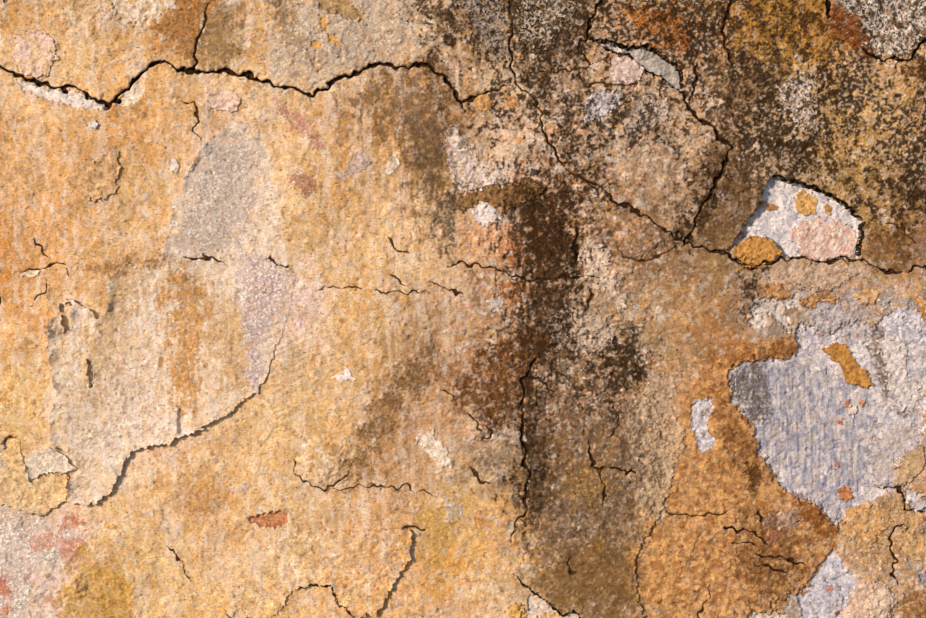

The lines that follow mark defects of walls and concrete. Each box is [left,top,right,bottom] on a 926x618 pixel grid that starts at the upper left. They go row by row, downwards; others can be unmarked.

crack [22,239,69,307]
peeling [0,90,293,516]
crack [319,227,600,310]
crack [0,0,926,275]
leakage [342,174,664,578]
crack [511,358,554,541]
flaking render [634,293,926,618]
spalling [728,175,866,268]
spalling [503,593,579,618]